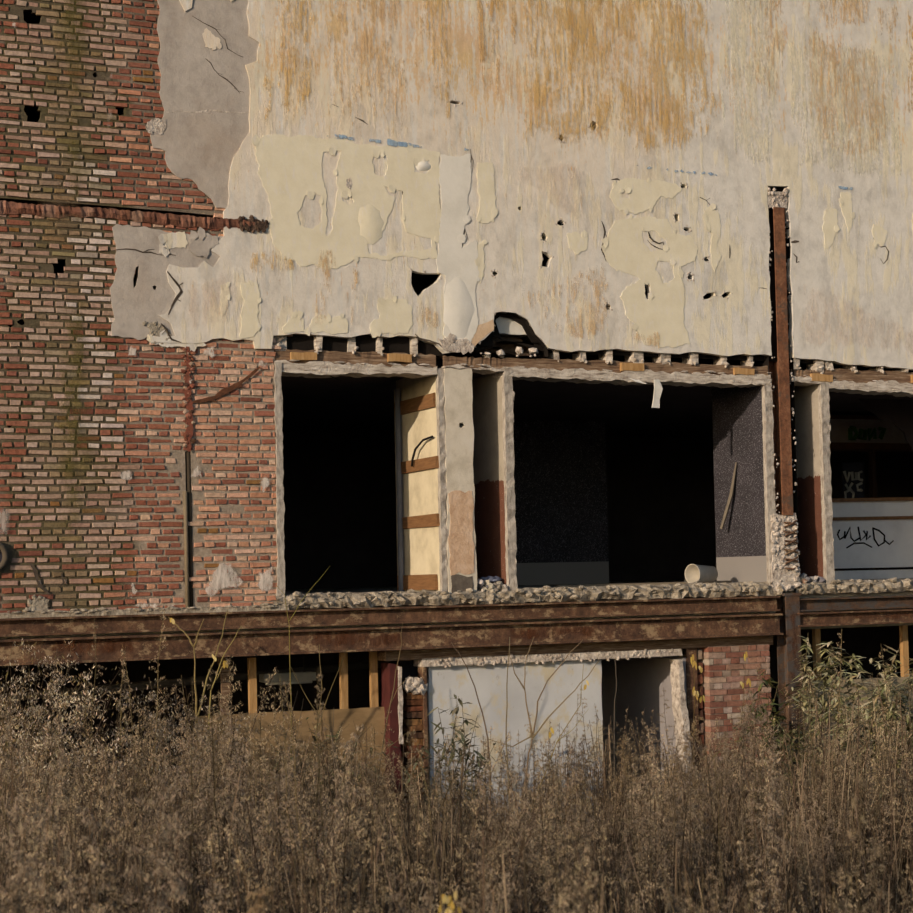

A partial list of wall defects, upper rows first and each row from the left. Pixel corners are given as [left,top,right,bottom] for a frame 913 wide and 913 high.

peeling [145,118,166,135]
peeling [203,28,222,50]
damp [264,0,316,118]
damp [477,0,503,81]
damp [511,0,782,156]
peeling [142,321,206,351]
peeling [158,227,220,258]
peeling [220,280,261,338]
peeling [238,134,548,359]
peeling [601,177,711,348]
flaking render [436,368,475,593]
spalling [502,370,518,590]